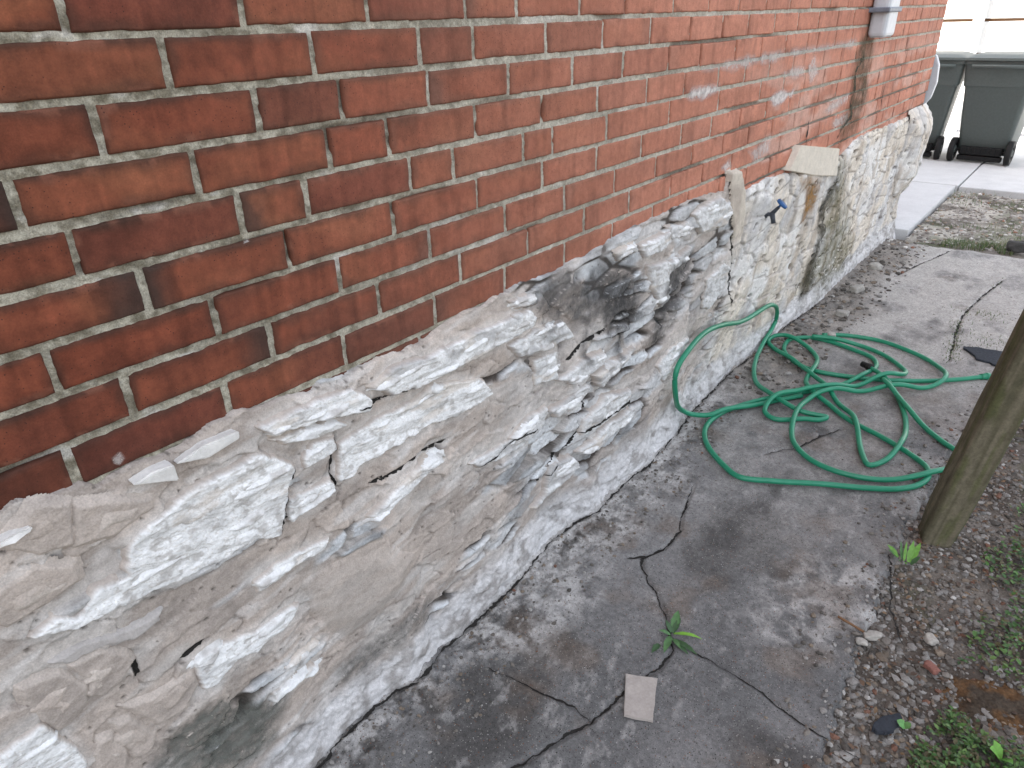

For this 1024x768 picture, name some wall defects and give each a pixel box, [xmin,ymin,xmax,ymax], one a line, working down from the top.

leakage [691,87,717,98]
leakage [772,91,793,105]
leakage [653,256,690,340]
crack [726,236,734,303]
leakage [800,185,834,296]
crack [948,280,1004,361]
crack [316,303,860,768]
crack [131,659,140,676]
crack [180,639,204,658]